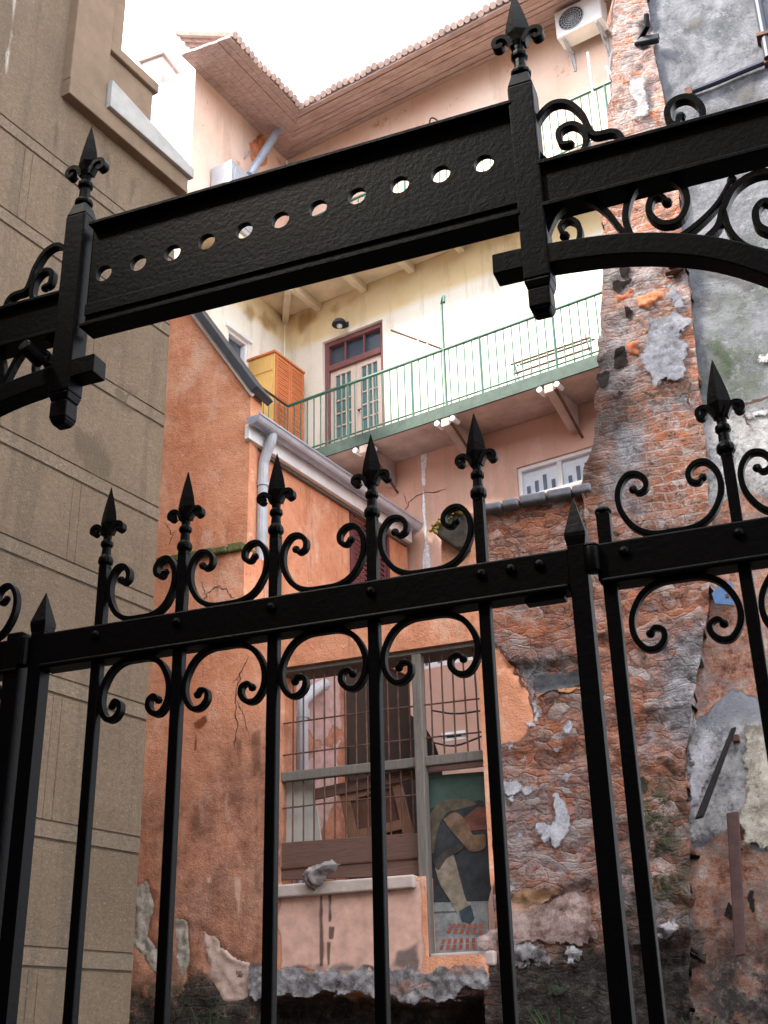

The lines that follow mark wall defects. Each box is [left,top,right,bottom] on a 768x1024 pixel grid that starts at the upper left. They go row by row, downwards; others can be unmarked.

peeling [623,71,649,123]
peeling [596,267,693,396]
crack [233,657,249,752]
peeling [503,778,543,803]
peeling [516,720,577,848]
peeling [686,730,718,812]
peeling [739,723,768,849]
peeling [134,881,157,971]
spalling [203,931,262,1002]
peeling [277,892,374,998]
spalling [388,881,490,1006]
spalling [511,888,598,947]